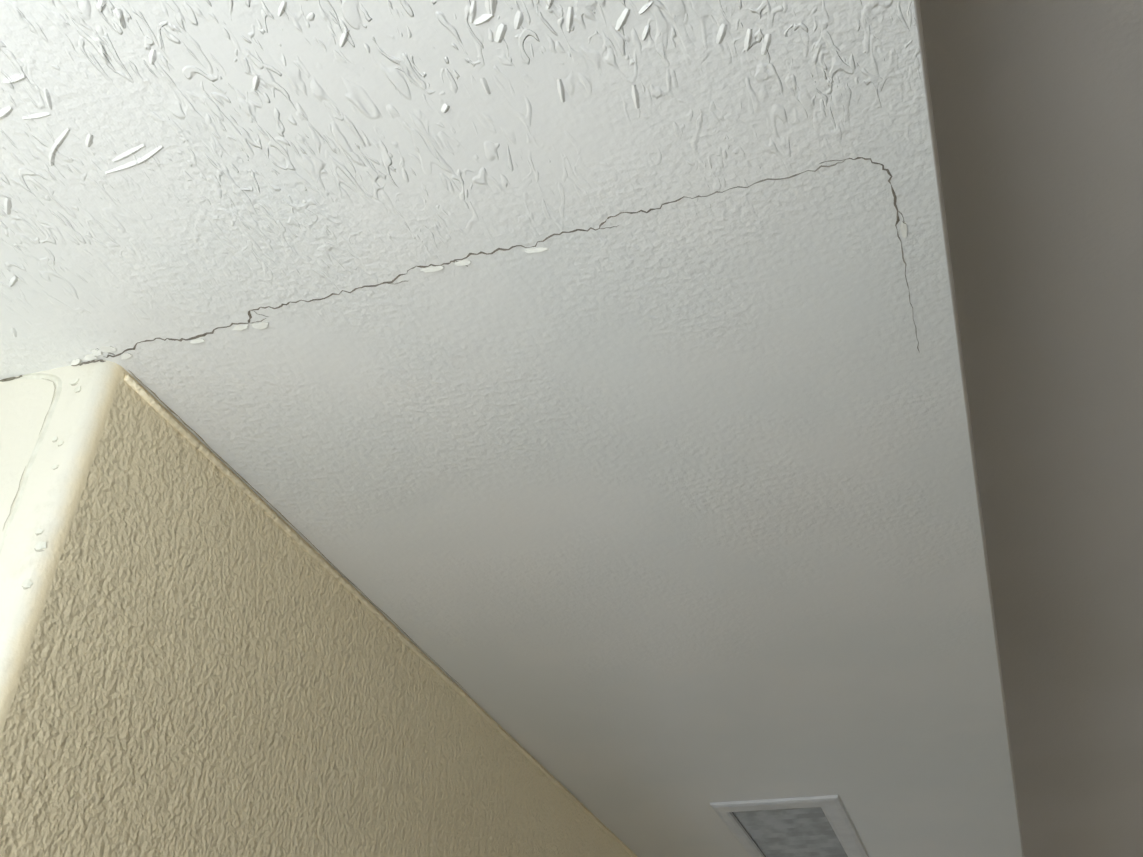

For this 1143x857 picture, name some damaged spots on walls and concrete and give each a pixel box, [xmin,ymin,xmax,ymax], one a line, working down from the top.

crack [0,374,22,382]
crack [71,157,920,685]